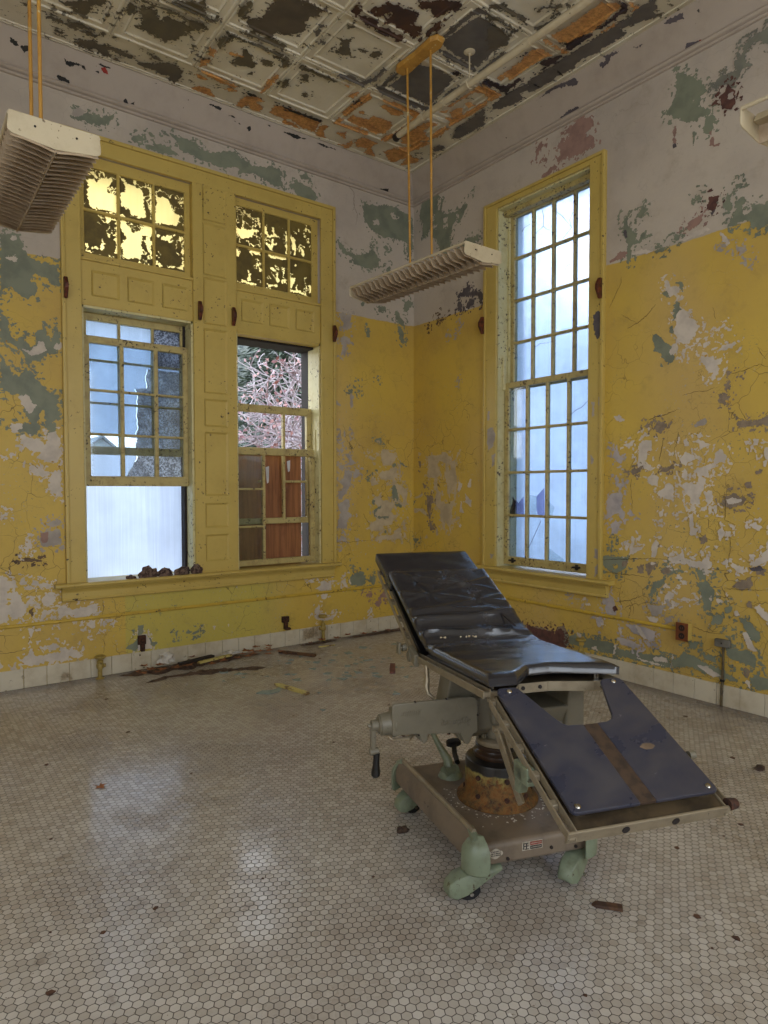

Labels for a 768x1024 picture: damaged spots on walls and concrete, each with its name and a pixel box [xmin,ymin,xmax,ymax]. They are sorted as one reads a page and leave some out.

peeling [128,128,321,201]
peeling [46,0,684,159]
peeling [336,186,483,273]
rust [192,2,639,165]
peeling [530,106,601,178]
peeling [661,19,768,148]
peeling [336,296,414,360]
peeling [0,228,117,670]
peeling [304,427,472,625]
peeling [522,273,768,692]